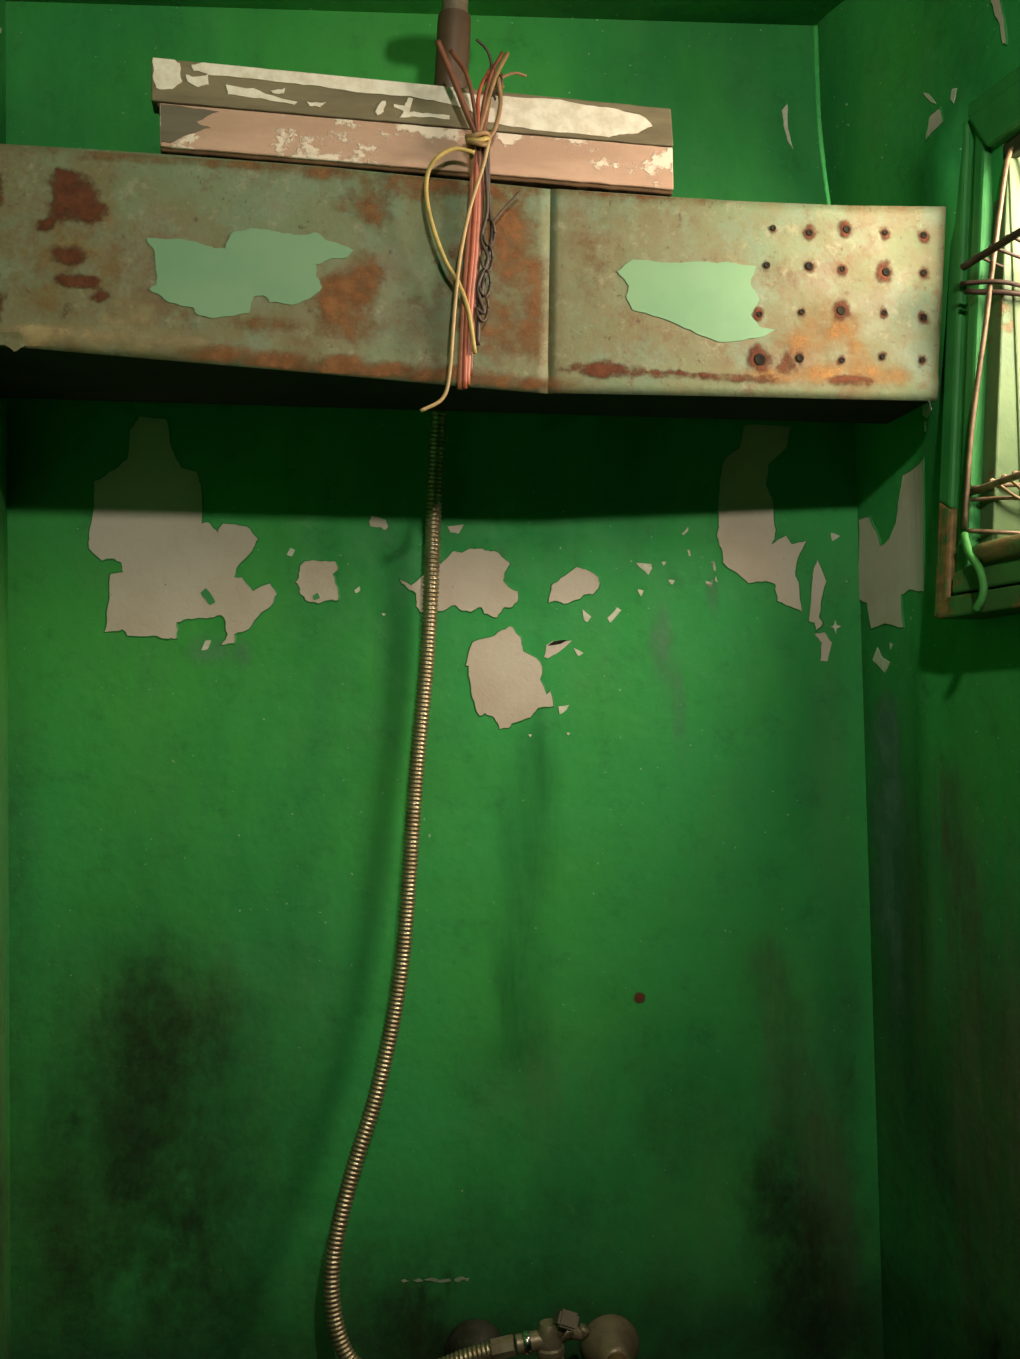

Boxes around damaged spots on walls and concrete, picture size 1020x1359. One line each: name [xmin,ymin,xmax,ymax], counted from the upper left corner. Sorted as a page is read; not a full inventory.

peeling [991,0,1008,46]
peeling [87,415,278,650]
peeling [369,516,388,530]
peeling [706,423,841,662]
peeling [858,458,926,630]
peeling [287,548,360,605]
peeling [547,566,601,622]
peeling [636,562,675,584]
peeling [399,547,583,737]
peeling [873,643,893,672]